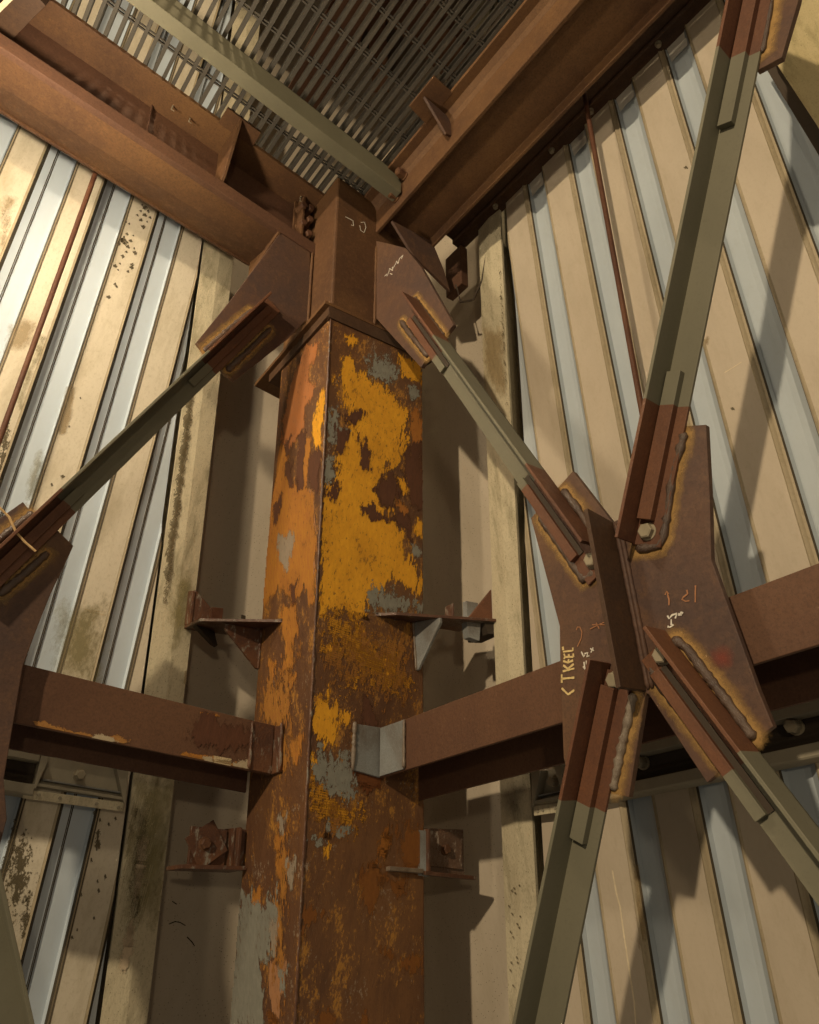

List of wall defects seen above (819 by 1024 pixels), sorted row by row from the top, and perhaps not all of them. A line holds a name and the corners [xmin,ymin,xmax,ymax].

damp [98,204,152,304]
damp [163,398,194,628]
corrosion [272,408,423,544]
corrosion [181,711,251,769]
peeling [230,333,424,1024]
damp [0,819,40,939]